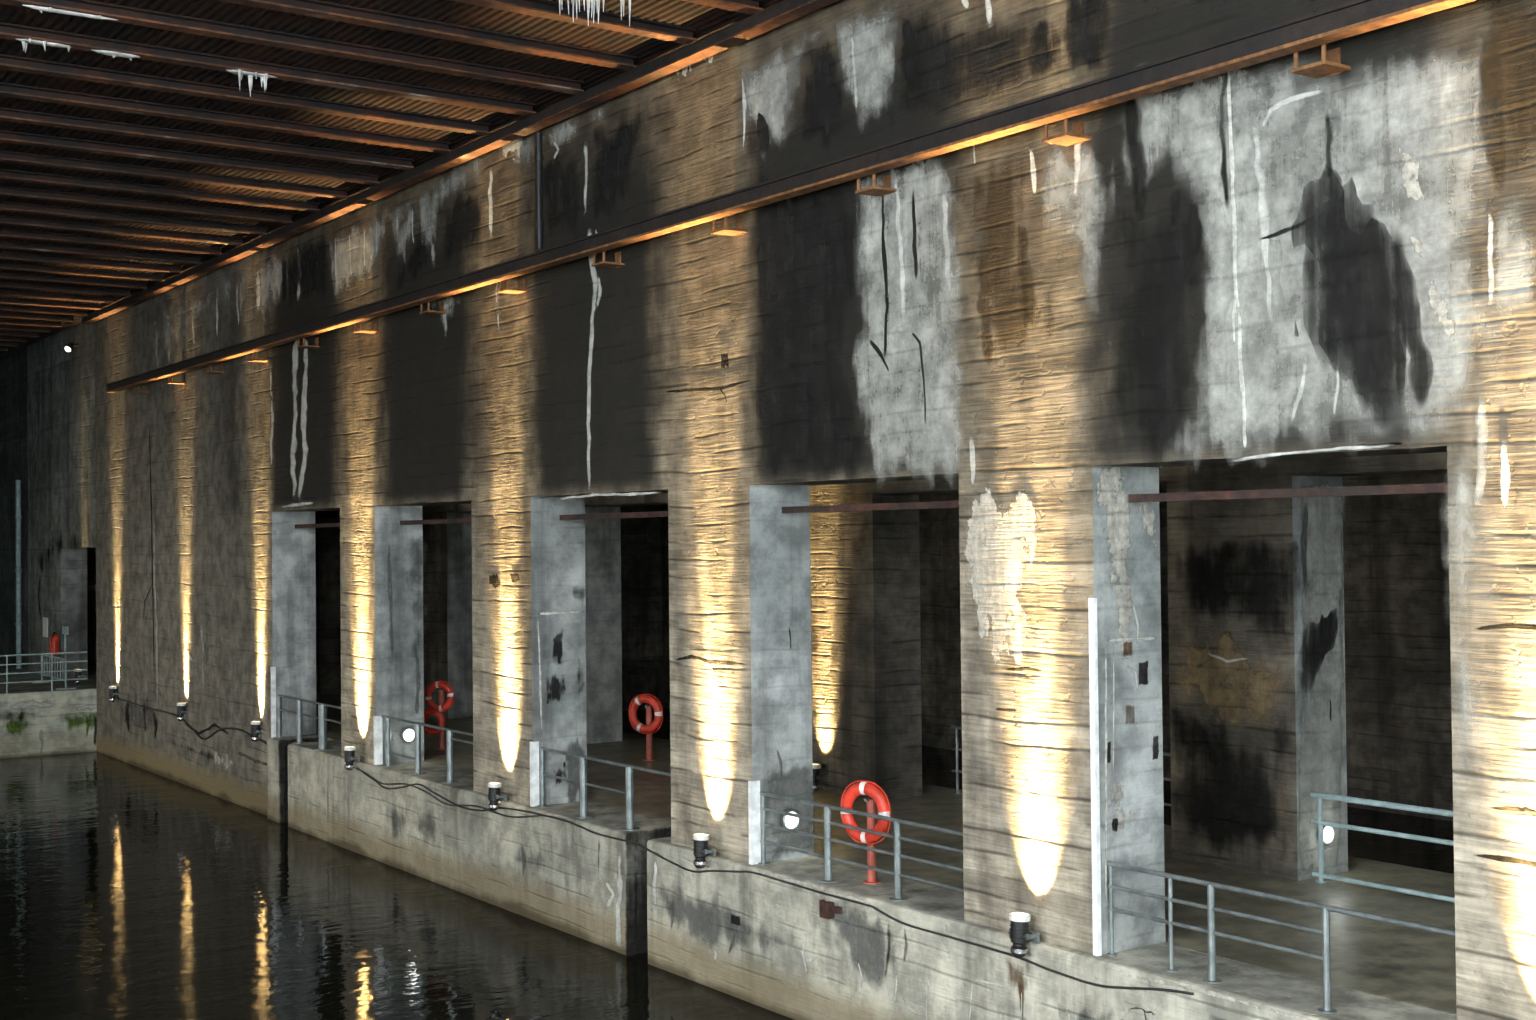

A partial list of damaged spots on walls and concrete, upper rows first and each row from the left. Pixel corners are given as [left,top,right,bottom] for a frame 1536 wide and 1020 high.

damp [269,340,312,507]
damp [155,162,493,367]
damp [499,138,530,159]
damp [544,111,640,236]
damp [559,0,631,26]
damp [563,254,656,499]
damp [676,54,717,81]
damp [756,158,959,481]
damp [1117,61,1531,461]
damp [1456,404,1510,587]
damp [1173,483,1344,871]